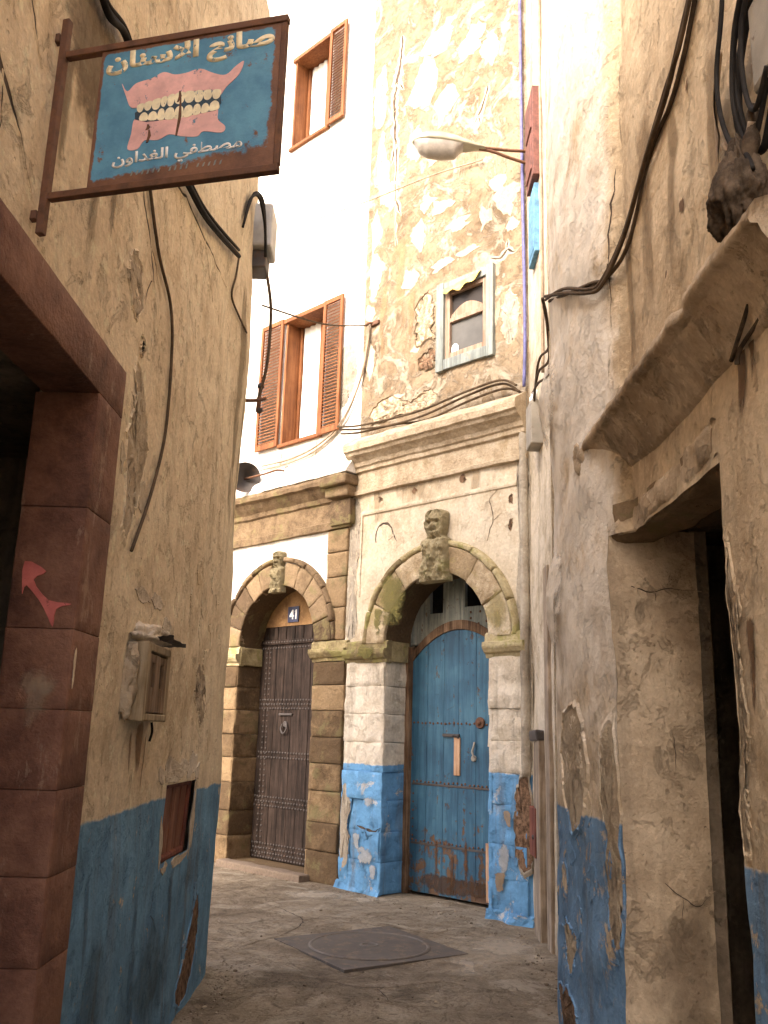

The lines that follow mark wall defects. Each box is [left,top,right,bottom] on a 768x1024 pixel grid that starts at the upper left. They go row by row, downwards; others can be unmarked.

peeling [404,14,500,130]
peeling [340,64,395,413]
peeling [410,173,521,253]
flaking render [401,244,481,372]
crack [487,490,501,541]
crack [630,585,702,608]
flaking render [723,526,753,867]
peeling [339,783,375,879]
corrosion [420,843,486,898]
flaking render [495,774,534,892]
flaking render [557,699,627,1024]
crack [665,883,715,922]